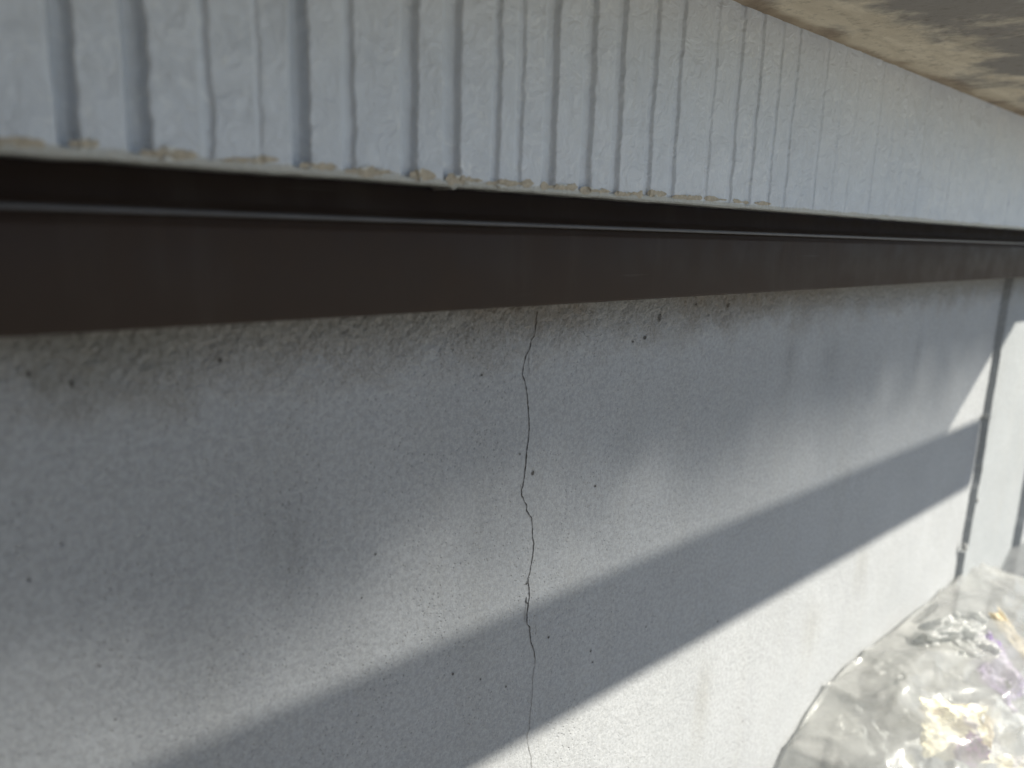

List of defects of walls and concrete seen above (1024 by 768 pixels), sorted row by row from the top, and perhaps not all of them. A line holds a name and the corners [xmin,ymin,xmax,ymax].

crack [520,311,538,765]